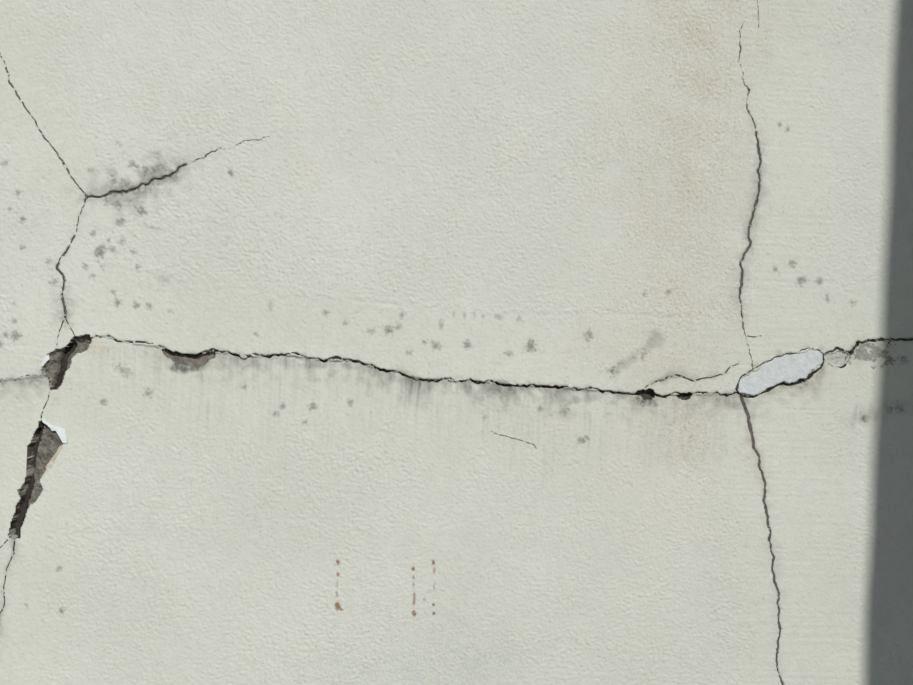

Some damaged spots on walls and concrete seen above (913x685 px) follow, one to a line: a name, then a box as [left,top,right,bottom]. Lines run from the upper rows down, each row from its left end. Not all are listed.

crack [0,53,269,346]
spalling [41,334,116,390]
crack [89,1,784,685]
peeling [735,342,895,398]
crack [849,338,913,357]
spalling [8,418,67,539]
crack [0,539,15,613]